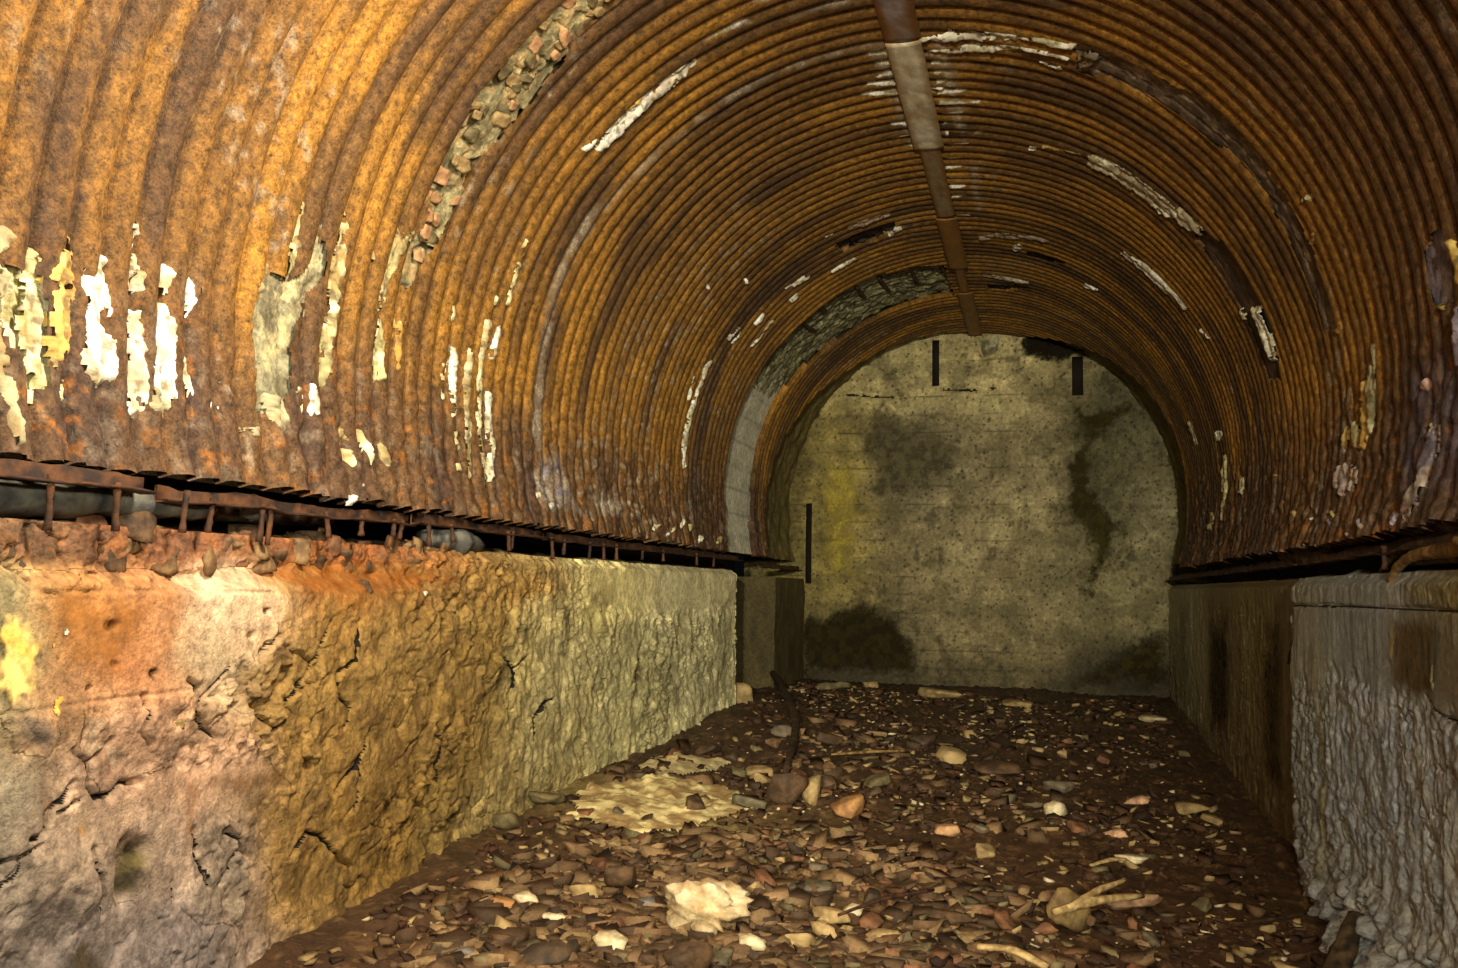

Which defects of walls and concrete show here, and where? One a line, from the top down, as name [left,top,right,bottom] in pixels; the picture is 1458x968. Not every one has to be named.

spalling [371,0,611,382]
peeling [581,58,697,152]
peeling [0,221,204,445]
peeling [238,202,349,436]
peeling [440,238,529,484]
damp [867,417,955,496]
damp [1068,405,1132,596]
crack [187,639,275,737]
crack [255,626,367,808]
damp [804,605,914,674]
crack [0,760,126,888]
crack [171,832,240,898]